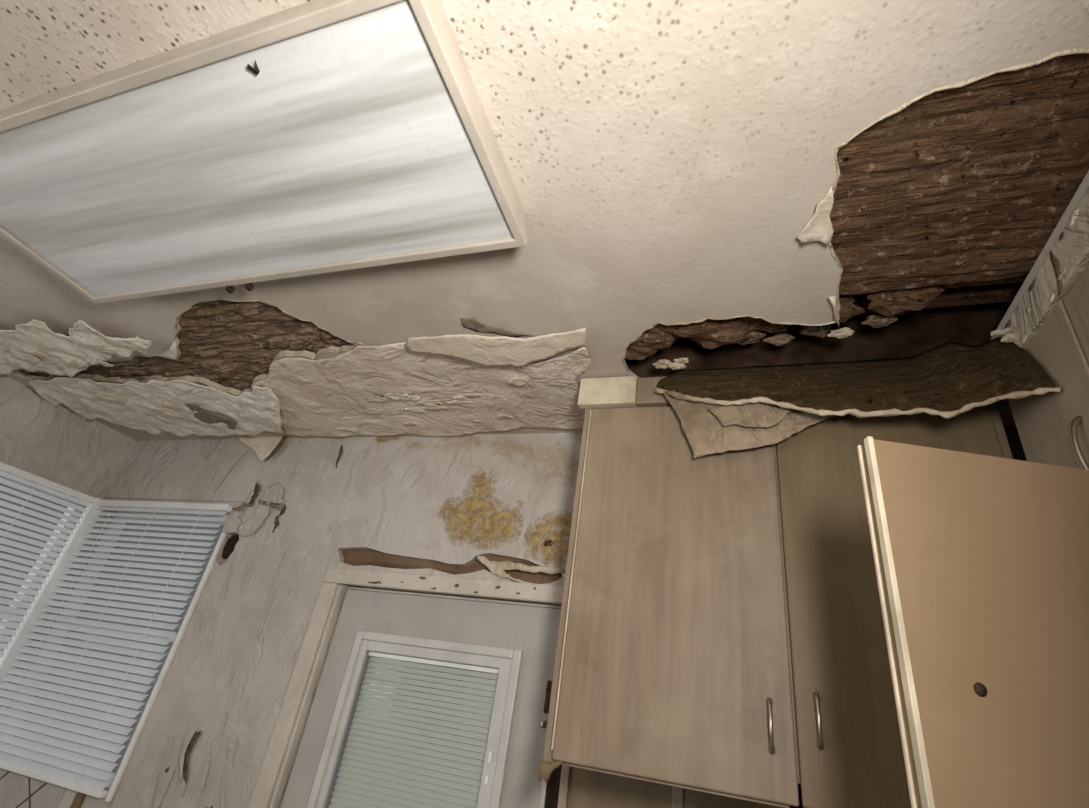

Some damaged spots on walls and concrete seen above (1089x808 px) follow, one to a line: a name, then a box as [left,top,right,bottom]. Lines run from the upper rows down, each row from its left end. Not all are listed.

peeling [797,187,834,246]
peeling [1059,209,1079,241]
peeling [1049,250,1066,302]
peeling [829,296,839,326]
peeling [990,320,1028,343]
peeling [0,317,592,462]
spalling [222,523,244,559]
leakage [441,473,572,566]
flaking render [342,549,566,594]